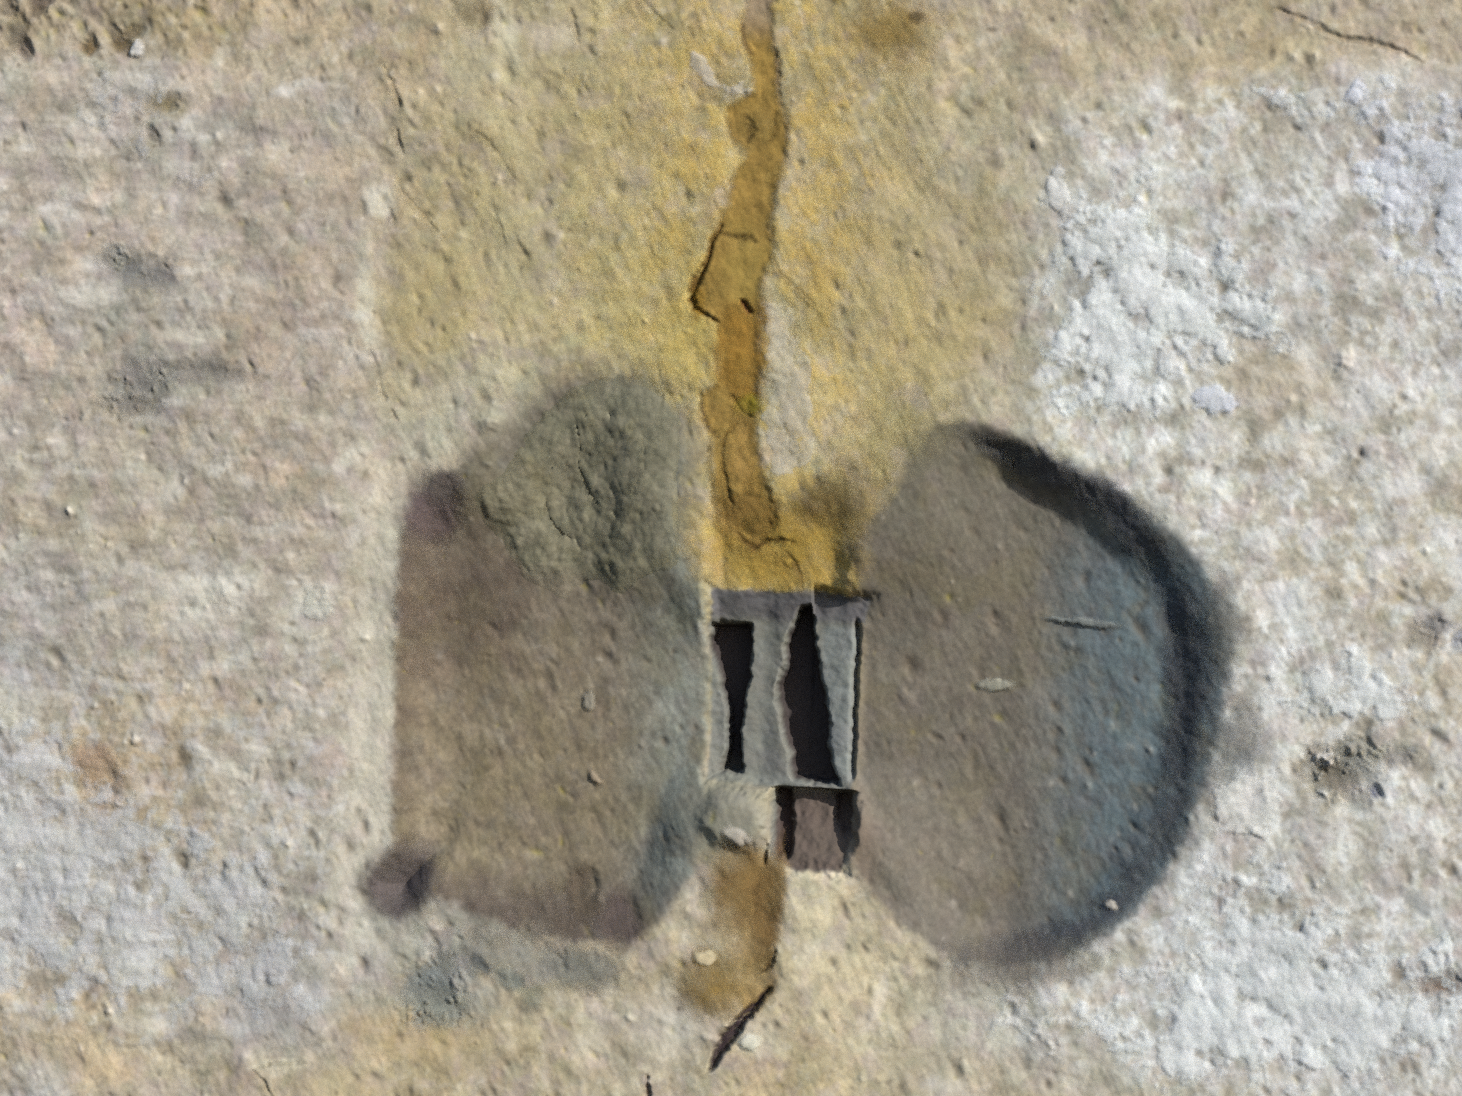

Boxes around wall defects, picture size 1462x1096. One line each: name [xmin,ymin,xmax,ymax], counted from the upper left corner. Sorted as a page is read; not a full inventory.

crack [689,0,800,574]
peeling [723,828,751,847]
crack [710,853,786,1070]
leakage [1166,591,1237,839]